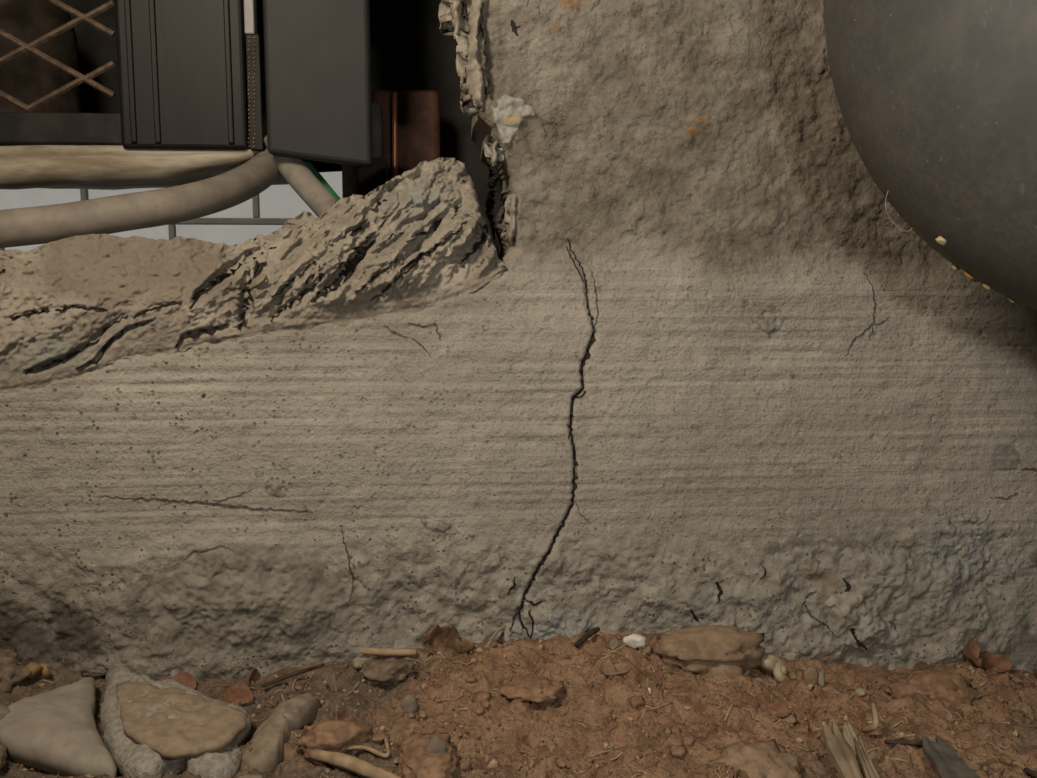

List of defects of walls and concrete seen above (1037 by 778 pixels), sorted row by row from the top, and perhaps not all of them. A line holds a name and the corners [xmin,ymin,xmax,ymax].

spalling [0,0,534,394]
crack [507,239,599,639]